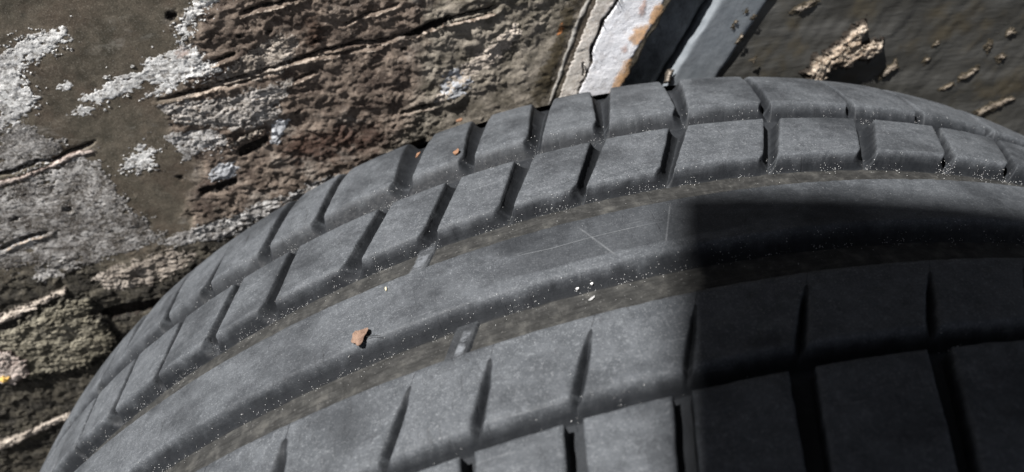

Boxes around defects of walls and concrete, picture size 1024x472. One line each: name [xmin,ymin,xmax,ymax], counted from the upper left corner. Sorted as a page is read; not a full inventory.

spalling [789,0,821,14]
spalling [798,14,885,81]
spalling [875,58,900,81]
spalling [937,27,1018,91]
spalling [971,96,1016,117]